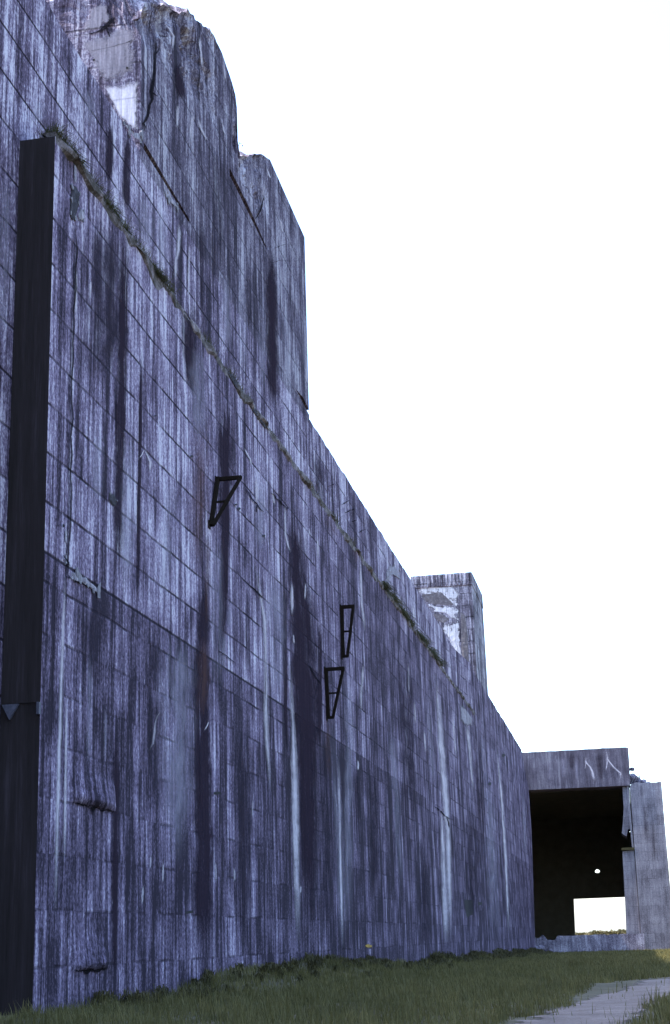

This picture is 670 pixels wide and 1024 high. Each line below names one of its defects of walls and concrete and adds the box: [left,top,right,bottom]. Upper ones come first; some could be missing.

peeling [84,6,144,143]
leakage [106,128,131,207]
leakage [90,239,152,585]
leakage [175,187,222,390]
leakage [266,258,278,398]
efflorescence [56,612,67,859]
leakage [112,743,120,961]
leakage [194,412,232,935]
leakage [283,515,359,916]
spalling [419,587,469,662]
leakage [424,694,480,925]
efflorescence [491,764,508,908]